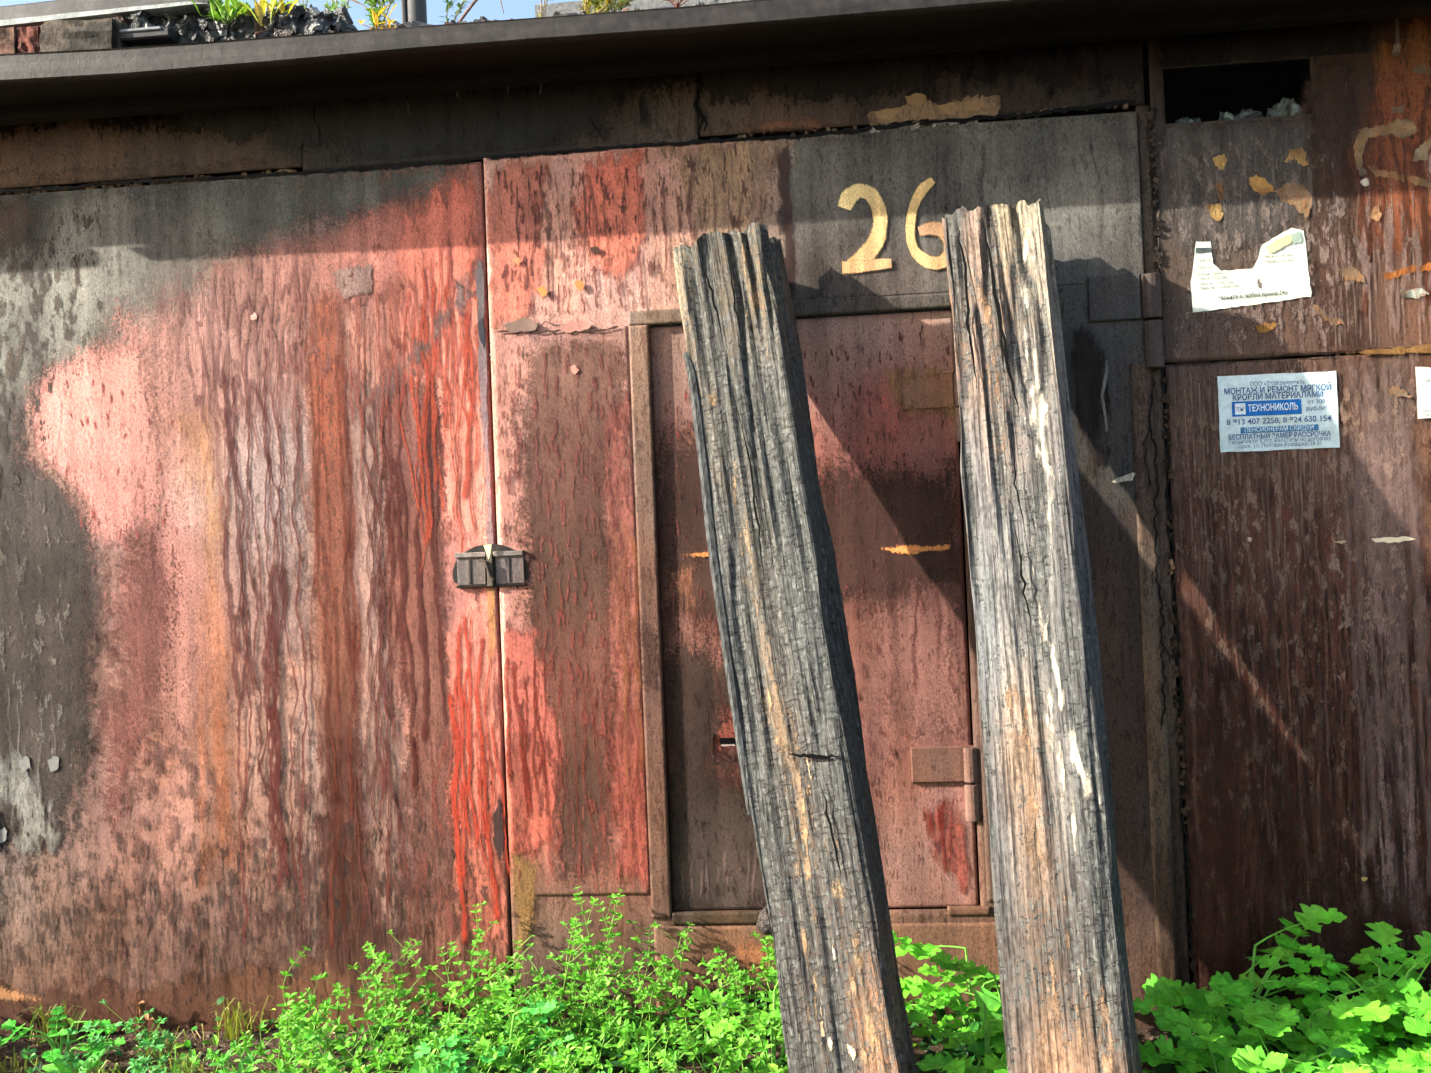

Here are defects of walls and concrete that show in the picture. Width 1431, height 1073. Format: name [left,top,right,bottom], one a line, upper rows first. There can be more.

leakage [497,143,796,316]
rust [1346,16,1431,326]
rust [0,157,648,1033]
leakage [0,191,757,1019]
rust [656,420,765,908]
leakage [804,325,973,901]
rust [818,443,960,612]
rust [923,798,969,894]
rust [1174,460,1431,1019]